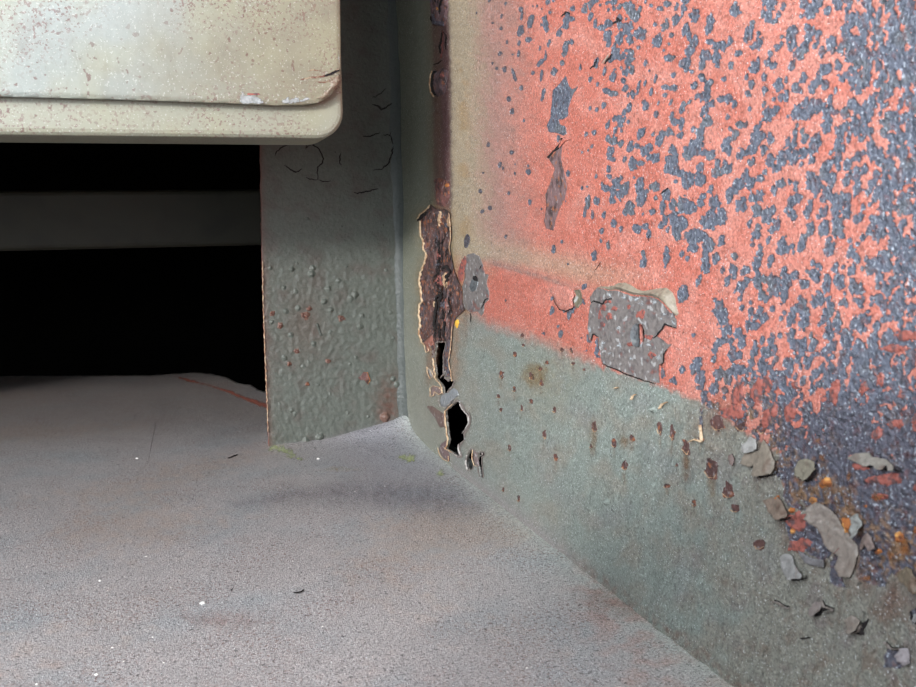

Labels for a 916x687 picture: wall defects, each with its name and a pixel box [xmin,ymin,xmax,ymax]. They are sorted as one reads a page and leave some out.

crack [275,144,341,182]
crack [354,89,394,194]
spalling [491,0,866,385]
rust [417,178,465,381]
peeling [426,367,459,428]
peeling [728,426,778,478]
peeling [794,459,818,483]
peeling [763,497,875,587]